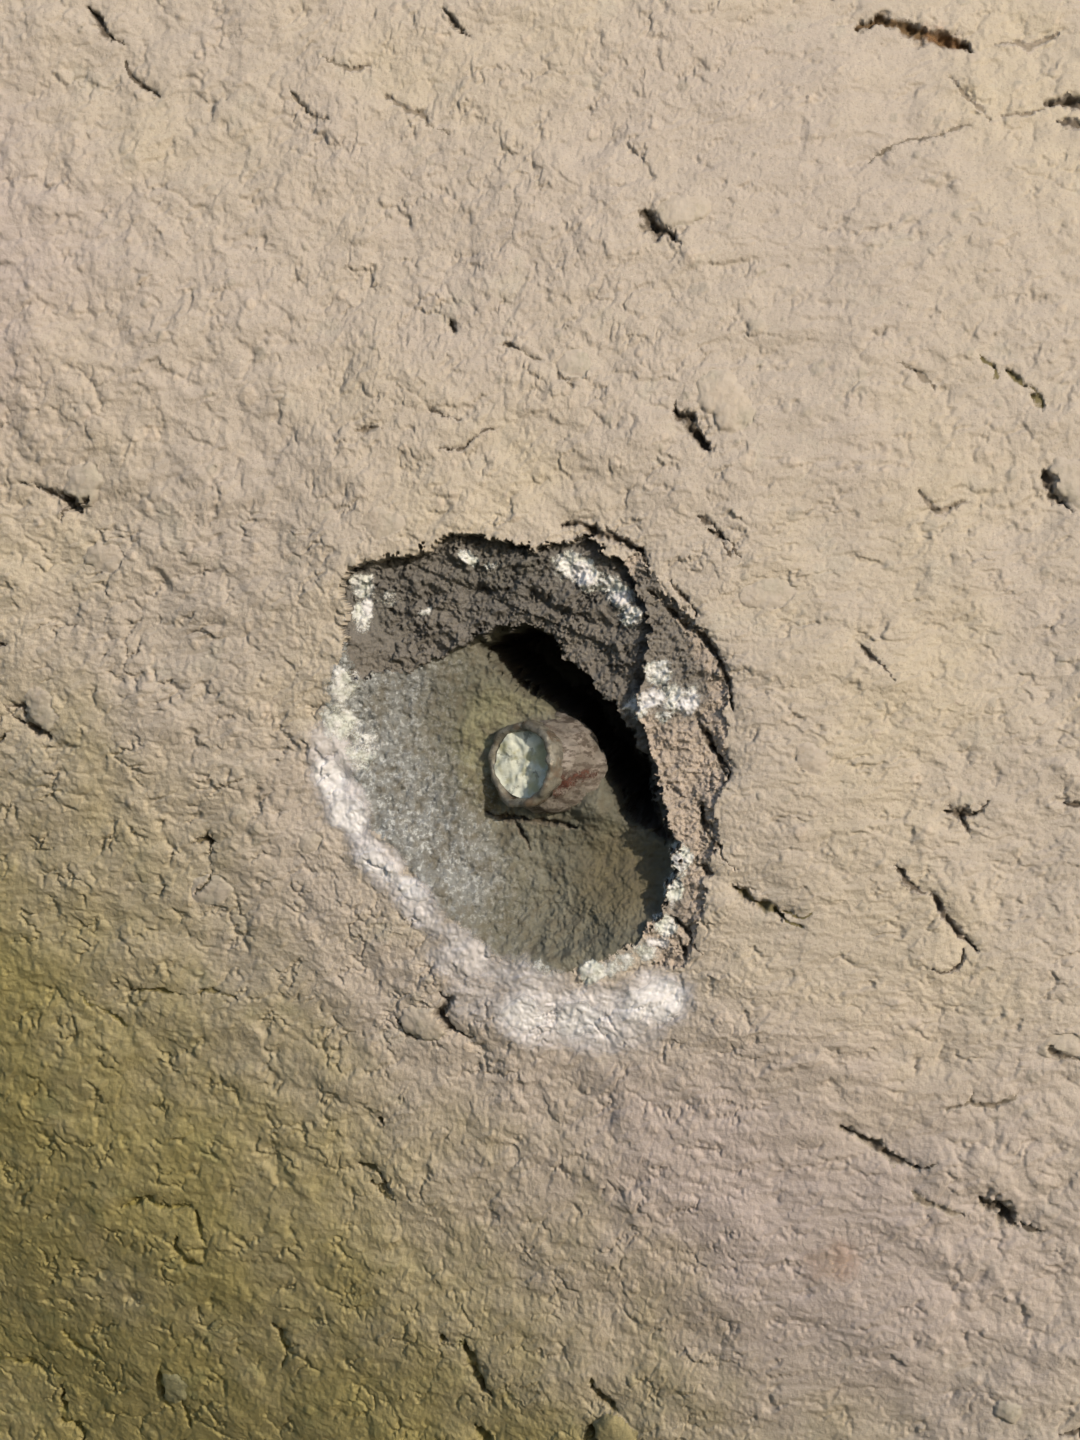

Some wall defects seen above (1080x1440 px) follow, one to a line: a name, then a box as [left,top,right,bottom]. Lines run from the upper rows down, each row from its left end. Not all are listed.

crack [867,75,1080,164]
spalling [697,516,742,558]
spalling [324,534,732,975]
crack [893,863,980,975]
crack [838,1125,965,1218]